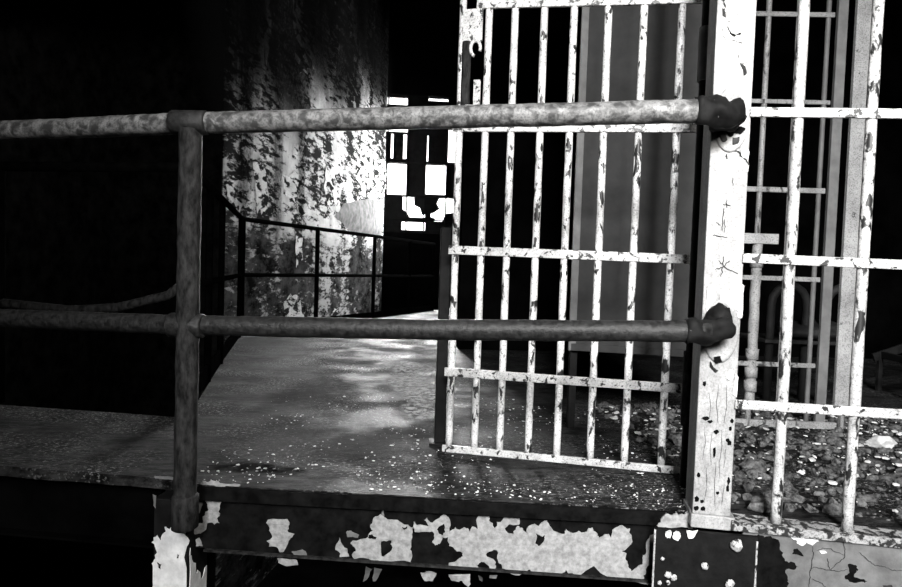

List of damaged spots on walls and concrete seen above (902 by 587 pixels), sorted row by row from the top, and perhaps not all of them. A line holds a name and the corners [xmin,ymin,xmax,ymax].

peeling [722,0,752,76]
peeling [151,500,221,587]
peeling [266,519,307,566]
peeling [335,496,705,587]
peeling [756,534,827,587]
peeling [845,564,867,583]